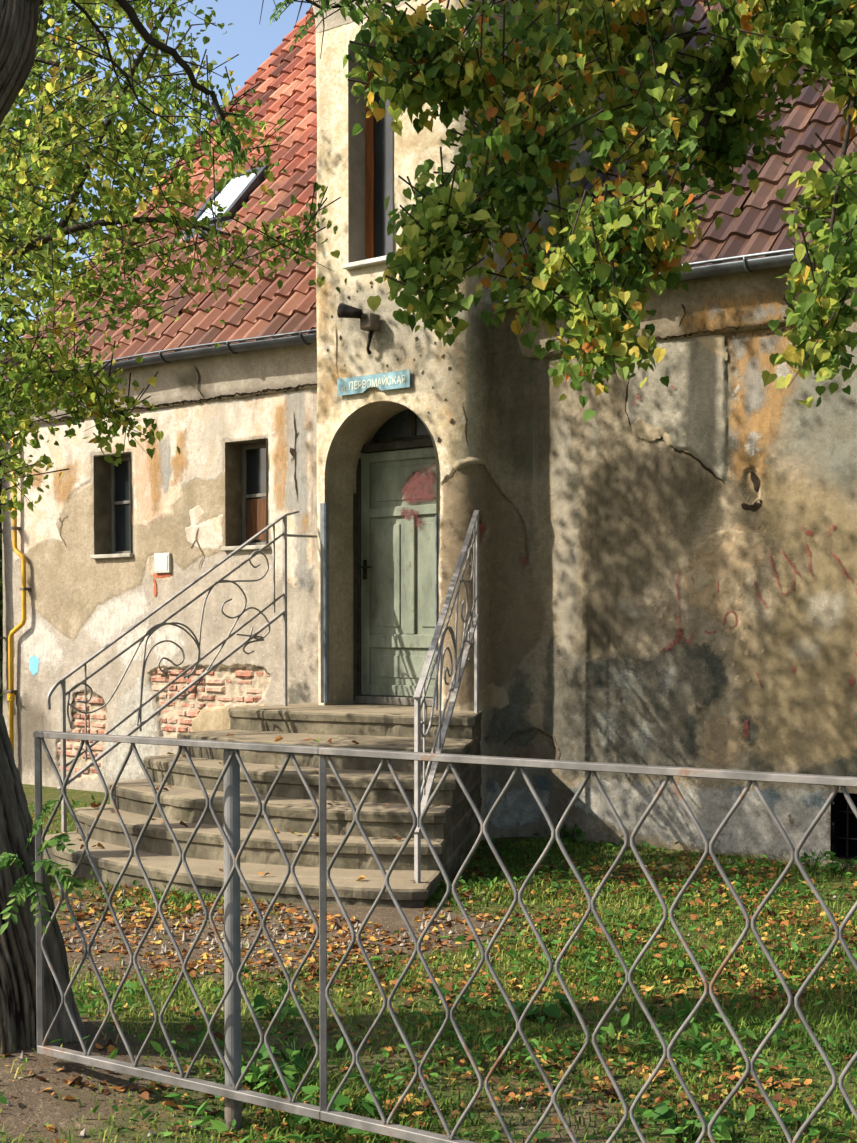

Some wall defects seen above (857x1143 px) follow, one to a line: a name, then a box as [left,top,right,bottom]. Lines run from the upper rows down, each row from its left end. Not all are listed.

spalling [55,688,108,780]
flaking render [10,388,315,641]
crack [33,329,338,497]
spalling [147,663,271,738]
leakage [485,458,728,783]
flaking render [625,334,767,656]
leakage [735,481,857,777]